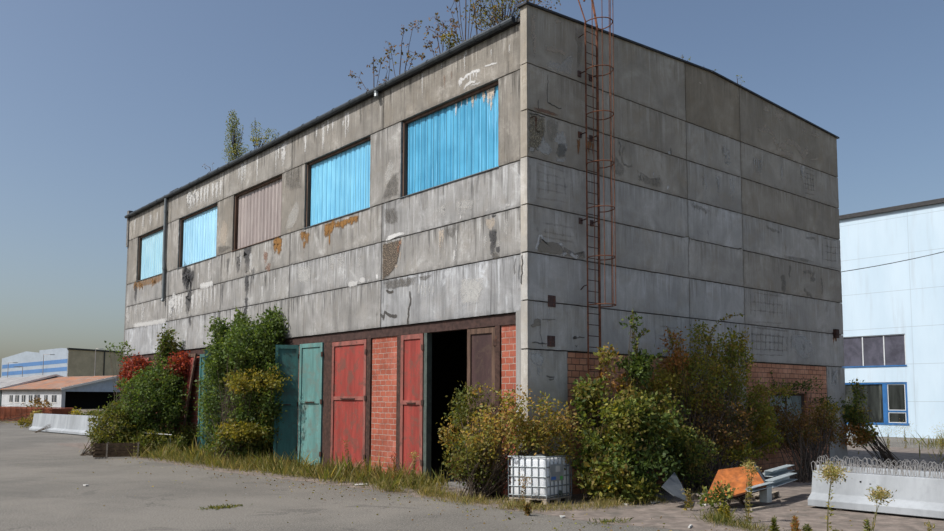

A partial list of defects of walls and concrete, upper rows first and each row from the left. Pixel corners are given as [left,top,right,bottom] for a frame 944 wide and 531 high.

spalling [529,113,544,149]
corrosion [324,216,358,245]
corrosion [264,237,282,270]
leakage [134,264,213,327]